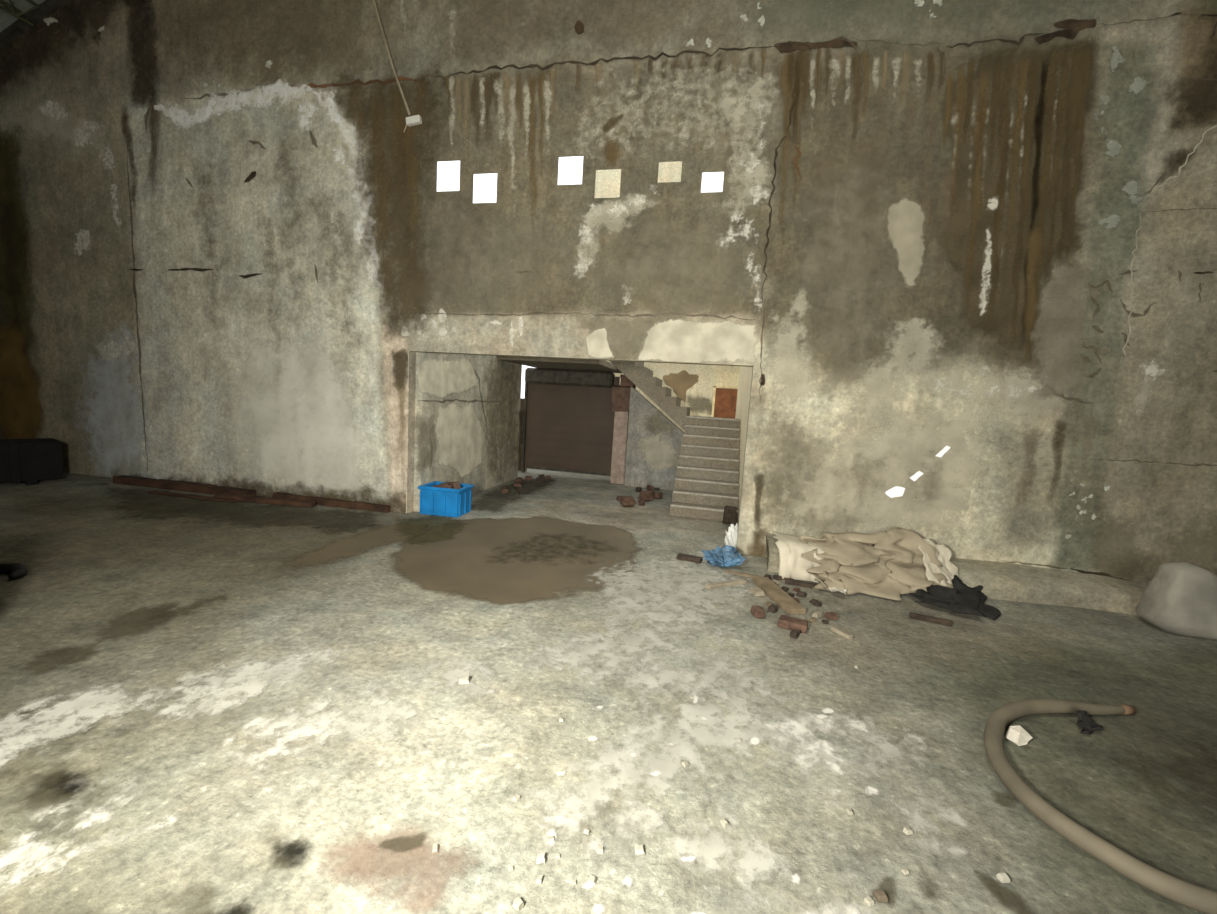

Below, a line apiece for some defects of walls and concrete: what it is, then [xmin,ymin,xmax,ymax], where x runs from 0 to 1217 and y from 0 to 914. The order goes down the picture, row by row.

damp [0,0,129,89]
corrosion [781,50,868,159]
damp [1173,52,1217,126]
damp [154,80,384,293]
corrosion [337,72,553,334]
damp [401,205,544,337]
crack [184,41,812,403]
damp [574,59,776,359]
peeling [887,199,925,286]
corrosion [928,42,1097,347]
damp [237,343,368,500]